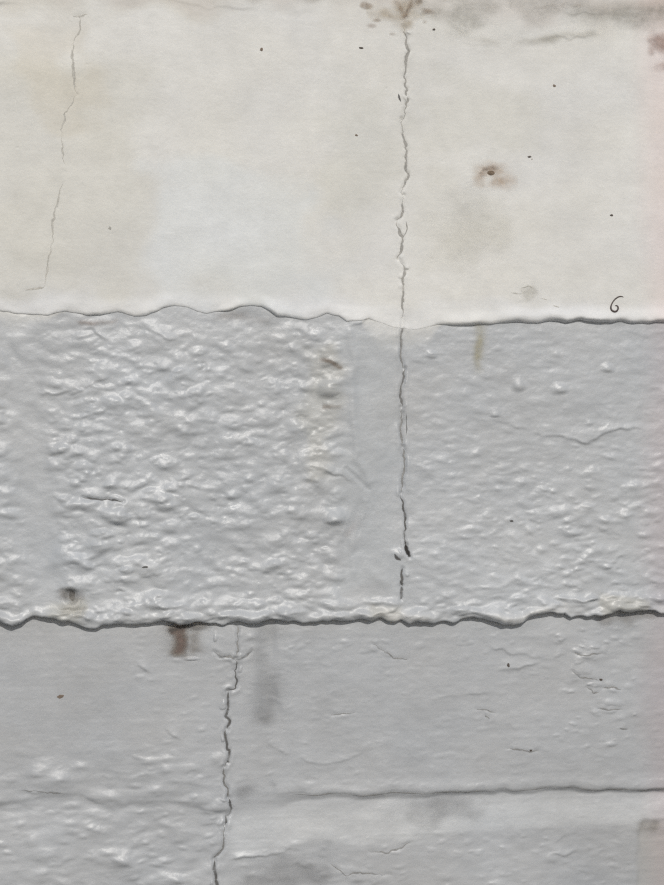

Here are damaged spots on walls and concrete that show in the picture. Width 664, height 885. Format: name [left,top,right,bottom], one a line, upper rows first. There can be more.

crack [395,30,411,599]
crack [210,627,249,885]